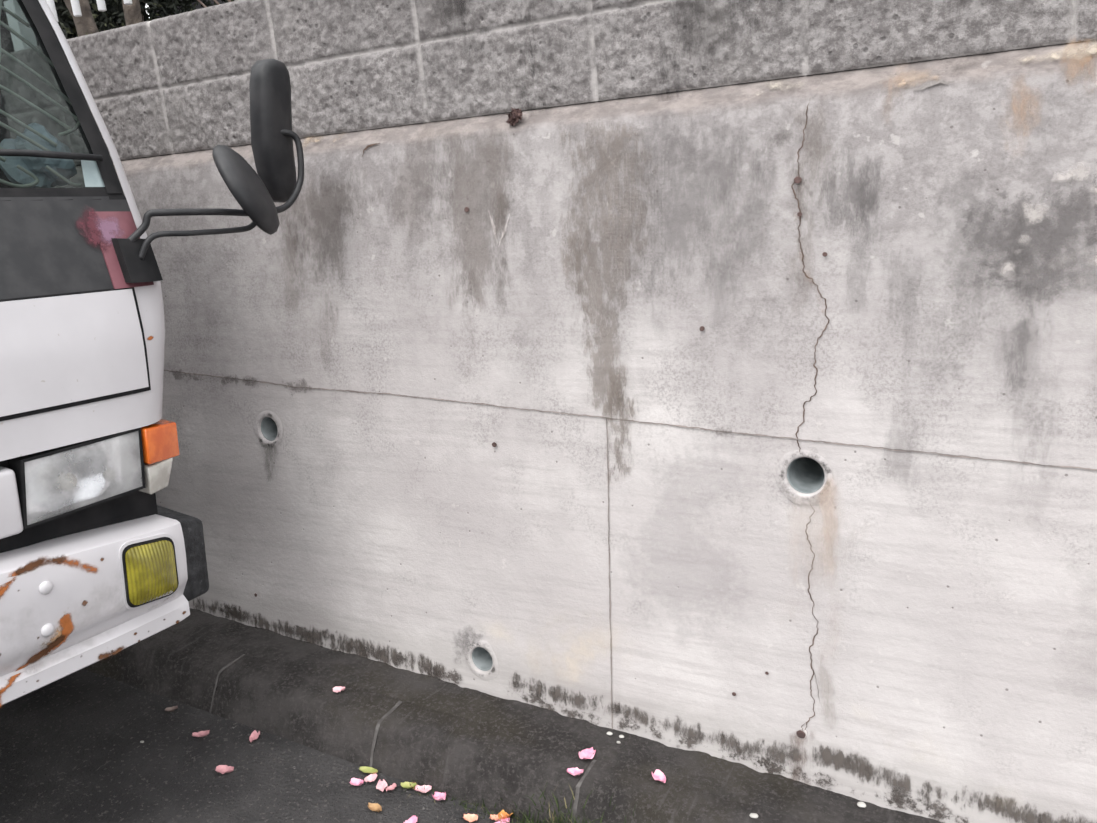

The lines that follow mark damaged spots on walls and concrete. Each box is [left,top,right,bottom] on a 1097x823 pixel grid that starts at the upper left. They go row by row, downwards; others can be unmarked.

crack [791,80,830,459]
damp [963,164,1097,297]
crack [801,504,822,731]